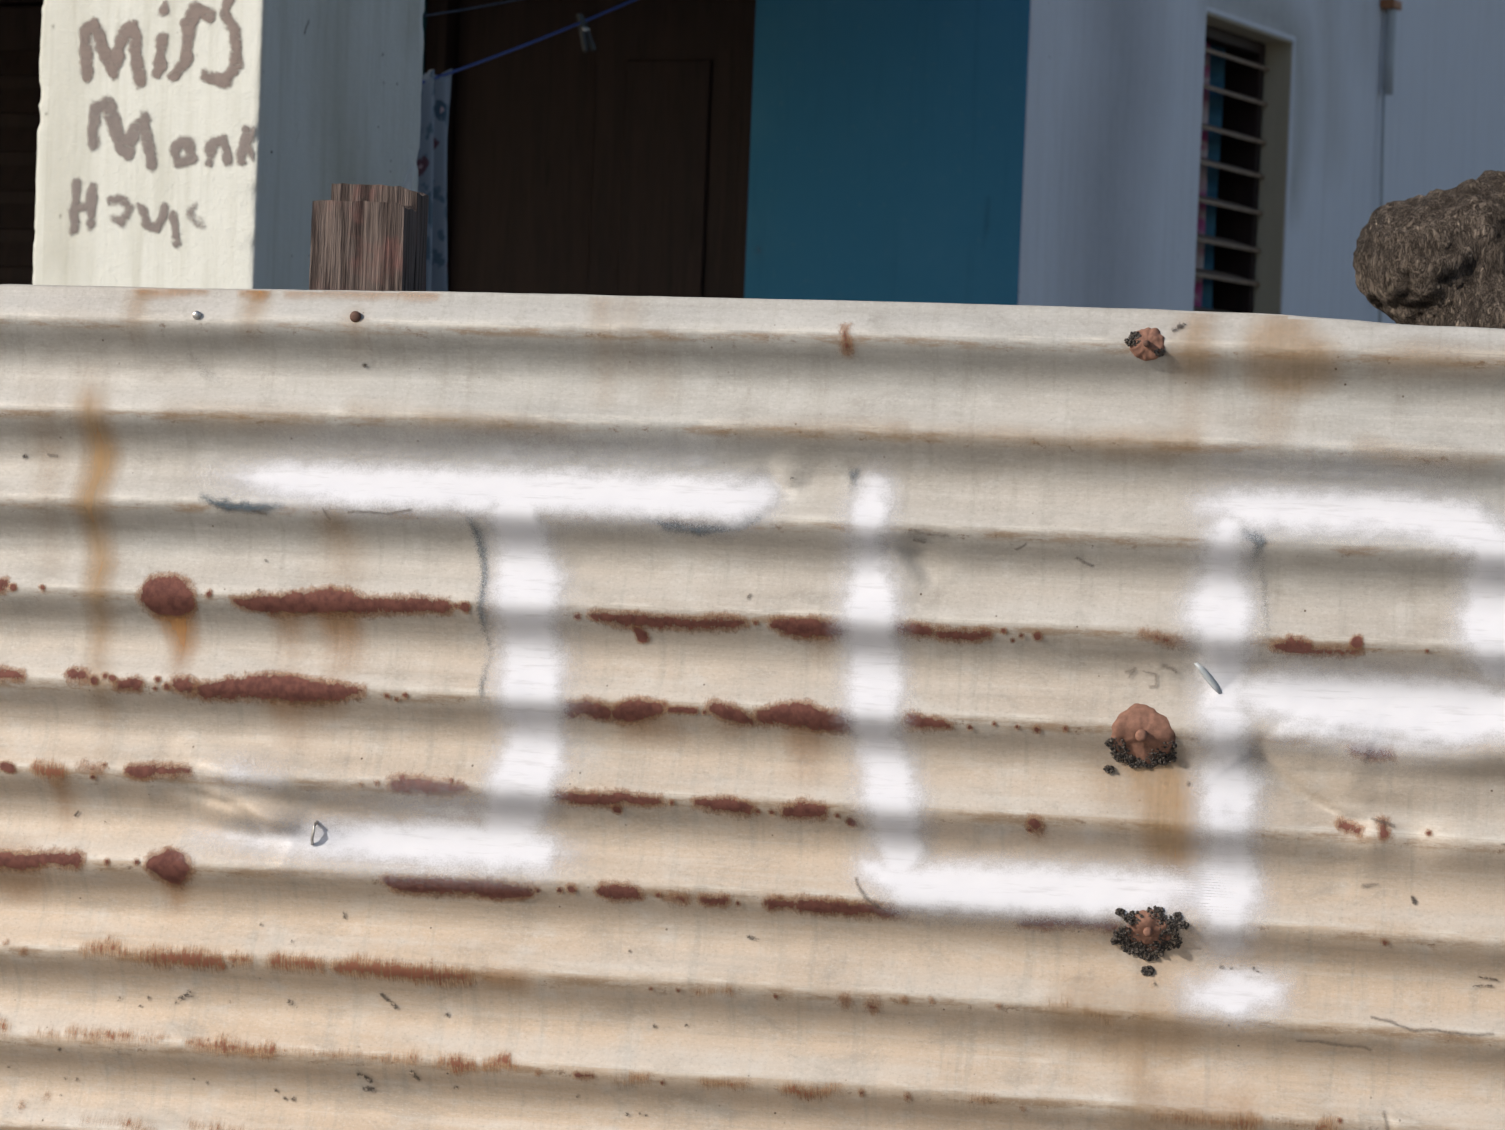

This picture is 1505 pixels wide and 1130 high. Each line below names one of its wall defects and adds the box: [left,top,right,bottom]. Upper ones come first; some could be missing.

rust [138,572,212,650]
rust [231,585,471,625]
rust [574,611,849,644]
rust [64,667,366,705]
rust [558,697,855,734]
rust [553,788,674,814]
rust [693,796,857,827]
rust [0,850,85,871]
rust [134,846,194,887]
rust [380,874,577,902]
rust [595,883,741,907]
rust [762,896,902,919]